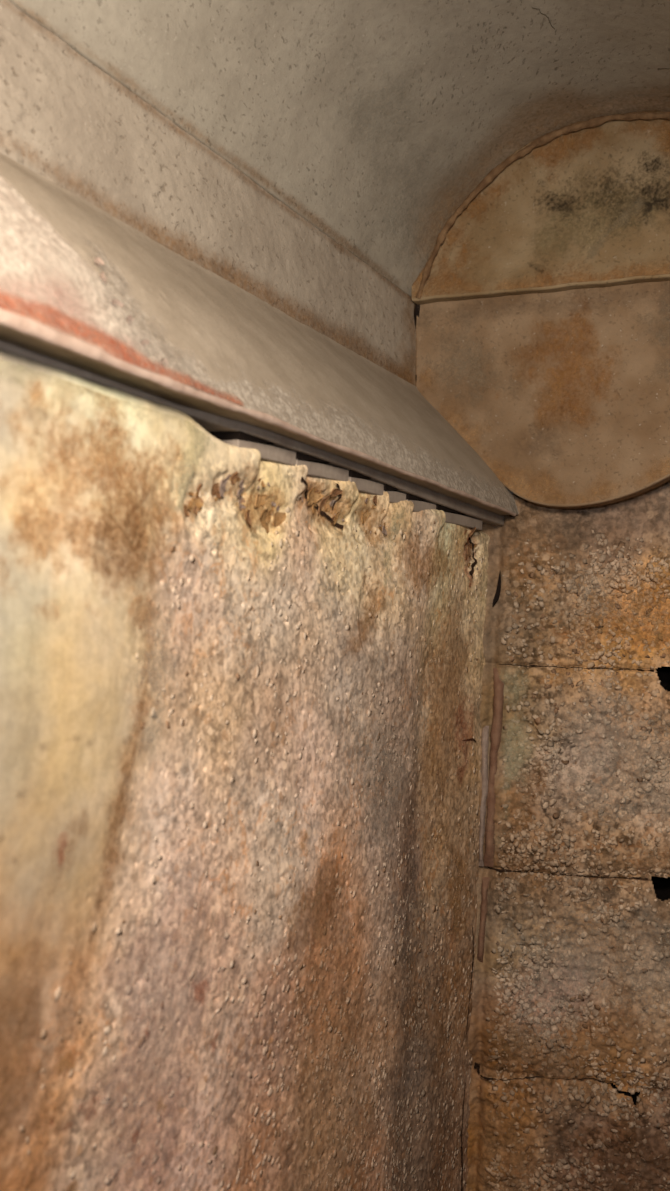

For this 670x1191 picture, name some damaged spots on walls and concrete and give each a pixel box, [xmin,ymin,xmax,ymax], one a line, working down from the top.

rust [0,293,242,406]
rust [15,394,160,584]
spalling [183,467,287,533]
peeling [301,476,387,541]
rust [487,459,616,504]
crack [466,927,474,1034]
crack [461,1062,612,1191]